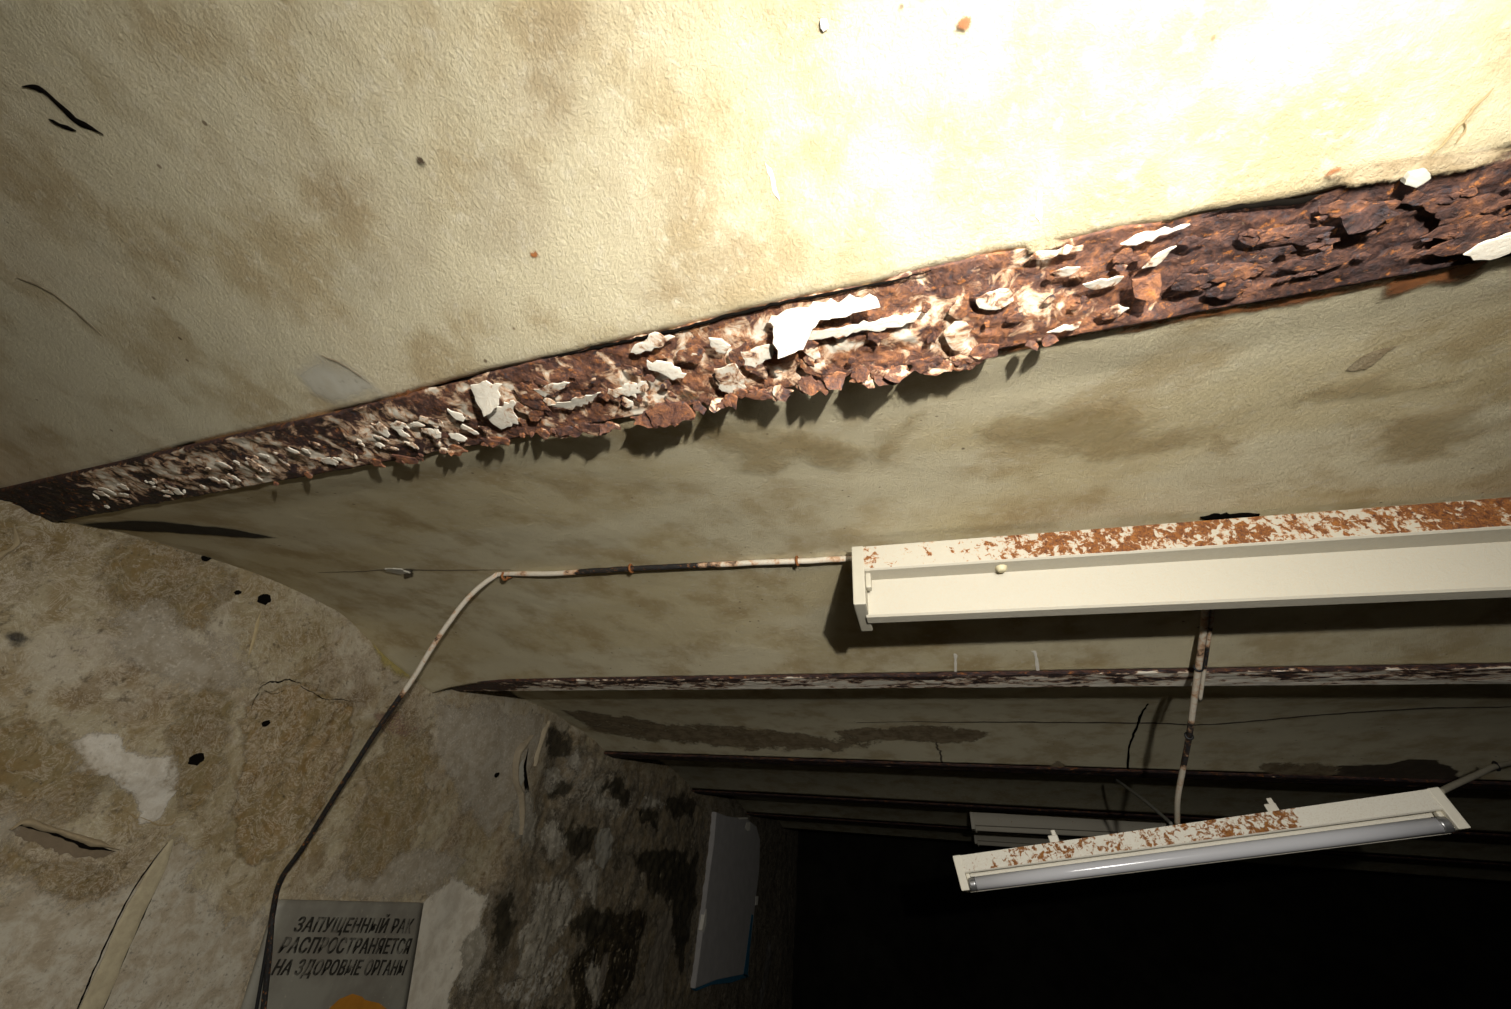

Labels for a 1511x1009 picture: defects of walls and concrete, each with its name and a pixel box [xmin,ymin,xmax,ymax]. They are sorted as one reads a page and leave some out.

corrosion [958,16,971,29]
peeling [976,288,1014,310]
corrosion [1043,266,1091,310]
peeling [1027,236,1124,290]
peeling [1120,224,1190,269]
corrosion [1097,184,1511,332]
peeling [1463,232,1511,260]
peeling [533,332,686,410]
corrosion [369,290,1077,467]
peeling [709,294,921,393]
leakage [99,538,354,866]
leakage [324,701,710,1009]